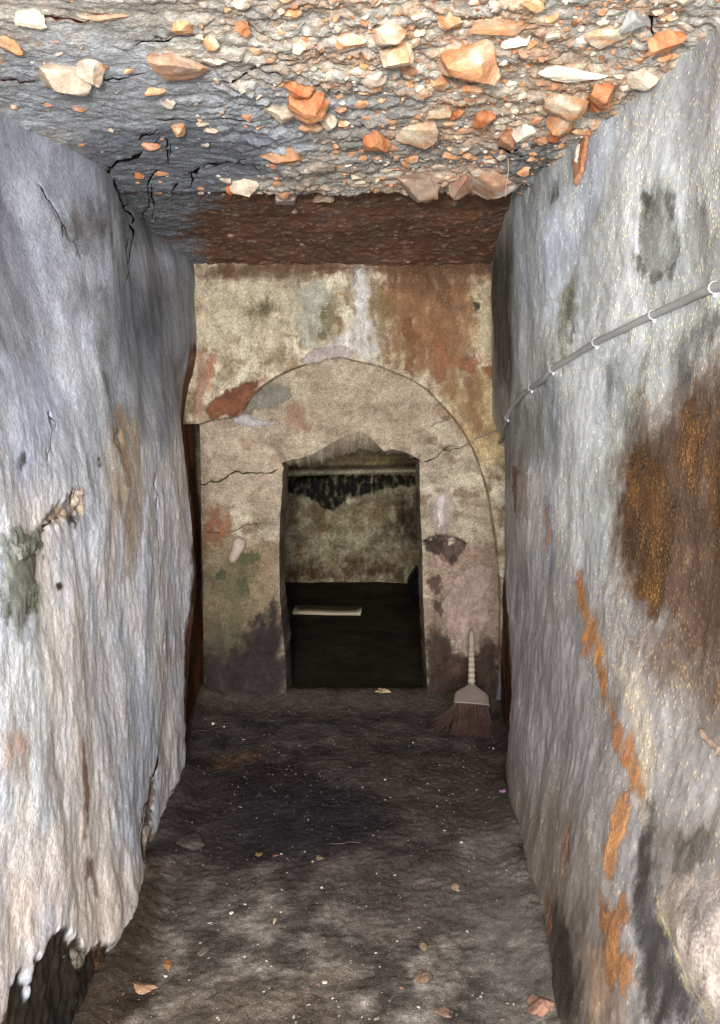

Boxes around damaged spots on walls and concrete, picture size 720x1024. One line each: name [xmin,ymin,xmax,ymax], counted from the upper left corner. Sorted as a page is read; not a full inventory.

crack [38,184,81,257]
crack [107,118,261,278]
leakage [634,187,677,284]
leakage [205,250,511,389]
crack [200,466,278,486]
spalling [207,376,276,427]
crack [424,417,467,462]
flaking render [0,488,83,640]
flaking render [423,487,498,658]
rust [575,570,644,879]
rust [597,887,634,999]